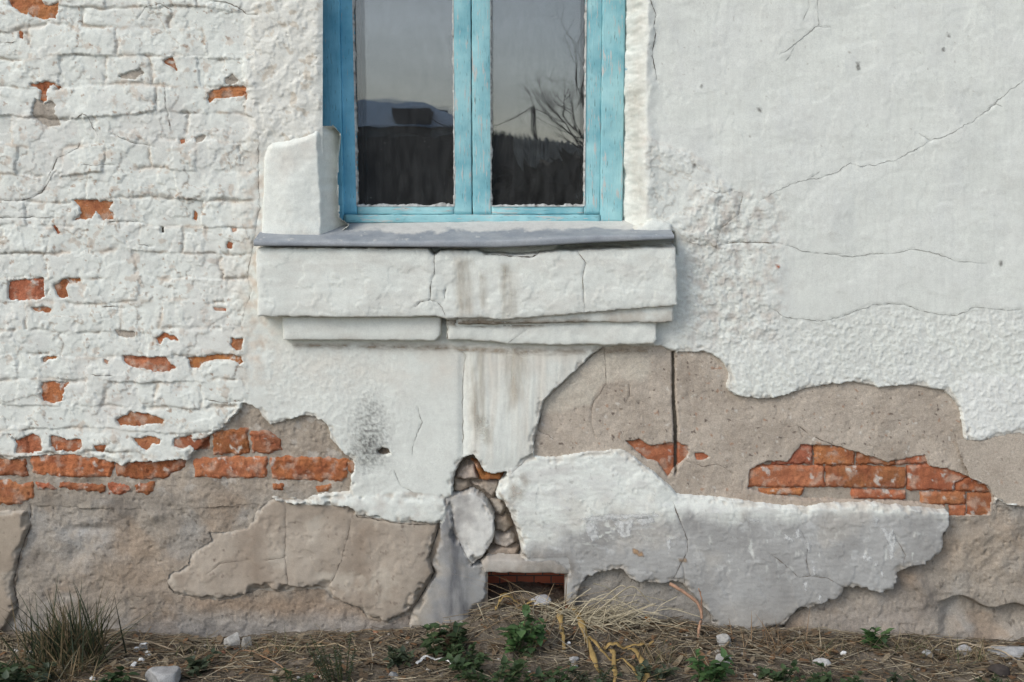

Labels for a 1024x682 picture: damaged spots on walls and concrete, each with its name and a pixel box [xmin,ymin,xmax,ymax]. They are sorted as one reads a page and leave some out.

peeling [9,0,59,20]
flaking render [31,81,62,127]
peeling [208,74,247,102]
crack [679,83,1020,263]
peeling [74,199,114,220]
peeling [9,277,81,313]
peeling [123,333,178,372]
peeling [187,338,243,368]
crack [672,351,733,474]
flaking render [0,403,409,638]
flaking render [453,454,521,560]
flaking render [534,345,1024,641]